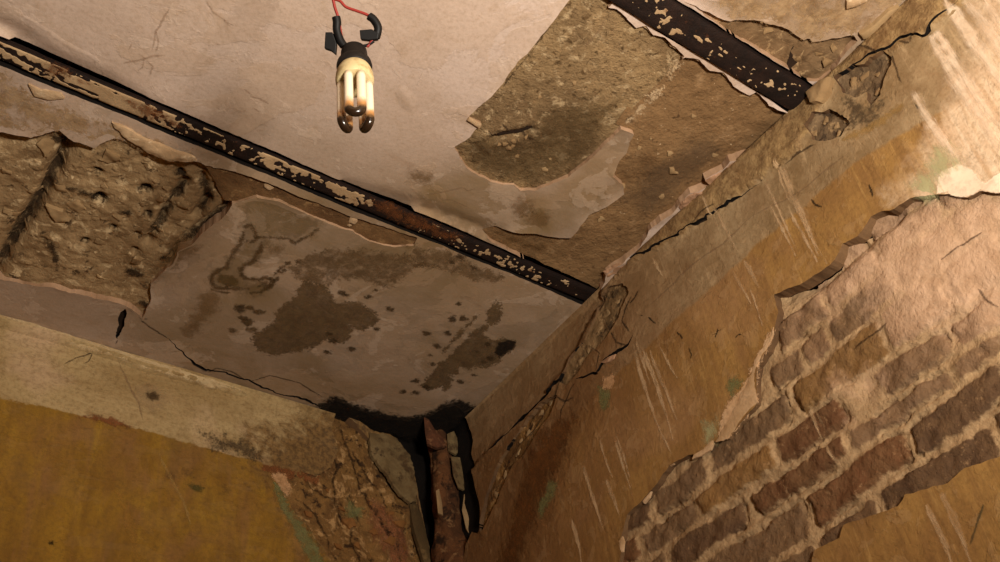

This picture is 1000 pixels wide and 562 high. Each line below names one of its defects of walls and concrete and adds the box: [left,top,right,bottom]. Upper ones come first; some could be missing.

crack [787,46,797,70]
crack [859,30,931,81]
rust [367,201,458,240]
flaking render [0,0,904,395]
crack [116,309,166,343]
damp [229,304,265,334]
damp [190,224,318,328]
crack [507,291,638,466]
flaking render [619,148,1000,562]
flaking render [271,418,421,562]